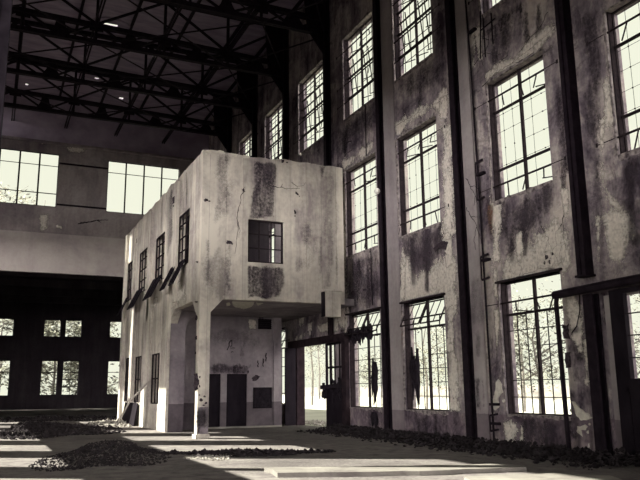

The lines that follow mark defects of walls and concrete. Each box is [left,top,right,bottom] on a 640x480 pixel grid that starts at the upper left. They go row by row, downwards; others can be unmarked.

damp [582,13,601,145]
damp [250,162,276,218]
damp [248,266,284,299]
damp [348,254,379,311]
damp [402,224,444,292]
damp [503,184,552,259]
peeling [485,24,592,437]
damp [624,158,638,241]